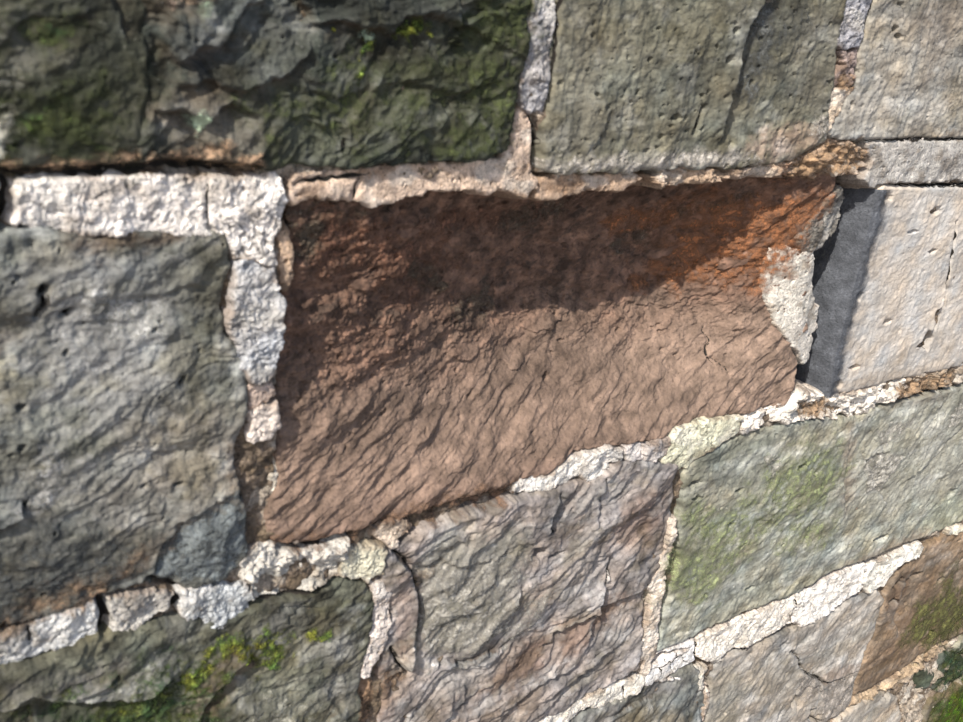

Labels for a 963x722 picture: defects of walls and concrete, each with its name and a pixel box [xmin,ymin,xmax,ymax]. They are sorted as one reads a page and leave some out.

spalling [267,172,835,584]
spalling [865,420,913,492]
crack [790,651,852,684]